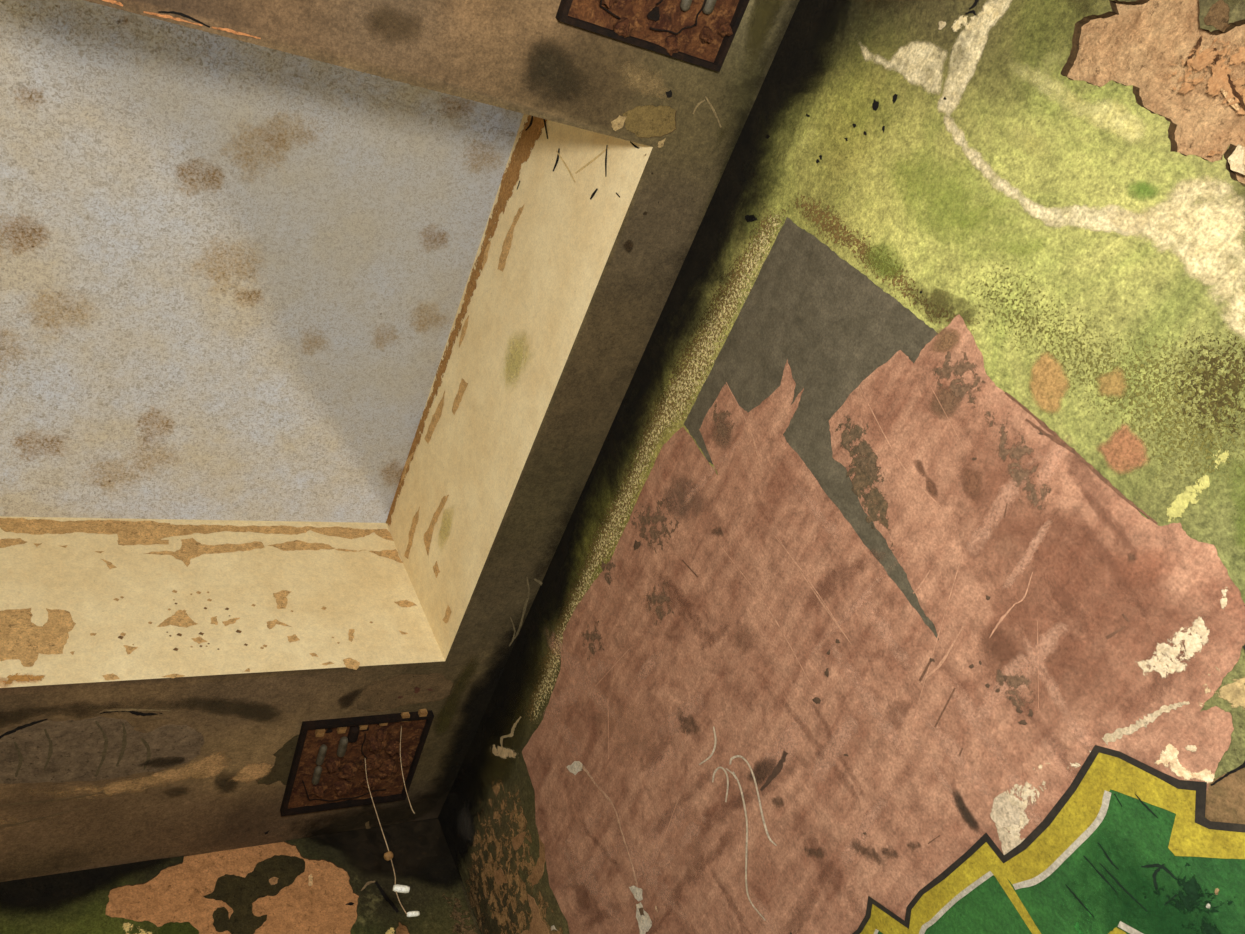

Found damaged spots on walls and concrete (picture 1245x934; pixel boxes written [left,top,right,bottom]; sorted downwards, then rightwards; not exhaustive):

peeling [143,11,261,39]
spalling [1061,0,1245,187]
peeling [0,115,609,578]
water stain [436,0,1245,799]
peeling [0,608,76,667]
peeling [148,590,267,651]
peeling [1135,616,1210,678]
peeling [1102,654,1245,745]
water stain [0,752,271,828]
peeling [990,763,1050,855]
spalling [1155,743,1245,824]
peeling [106,841,359,934]